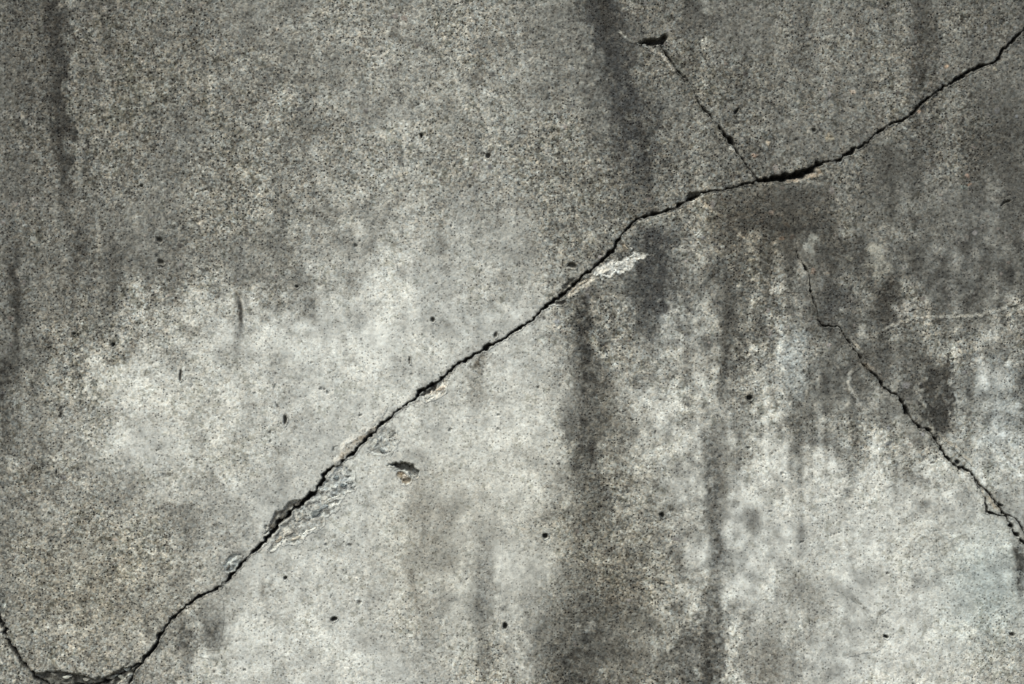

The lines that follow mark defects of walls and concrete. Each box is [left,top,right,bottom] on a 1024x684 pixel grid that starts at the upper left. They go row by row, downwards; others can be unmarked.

crack [616,27,1024,202]
crack [127,200,690,684]
water stain [515,0,683,684]
spalling [561,242,652,299]
crack [695,198,747,241]
water stain [673,188,957,684]
crack [789,200,1024,546]
crack [0,612,143,684]
crack [834,586,889,658]
crack [912,666,926,684]